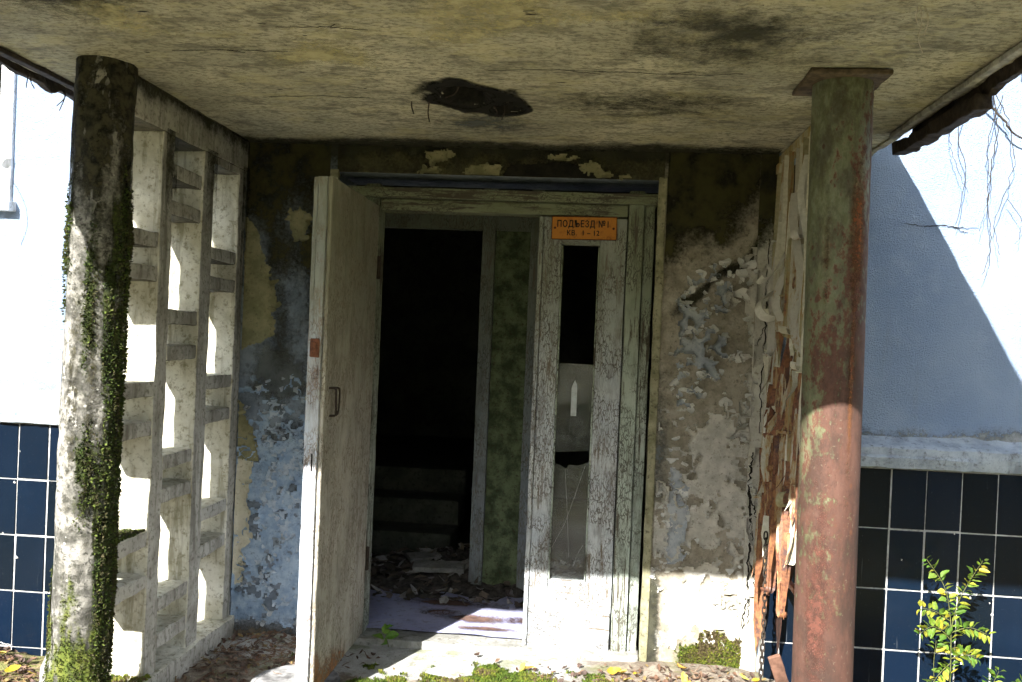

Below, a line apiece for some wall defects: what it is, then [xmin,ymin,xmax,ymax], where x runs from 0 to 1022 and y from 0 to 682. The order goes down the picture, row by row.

peeling [241,217,282,350]
damp [68,55,782,411]
peeling [417,149,456,174]
hole [411,79,533,122]
spalling [462,154,632,180]
damp [635,9,857,65]
rust [850,162,865,308]
crack [904,223,979,233]
peeling [230,374,306,628]
peeling [649,240,776,654]
crack [742,239,770,629]
rust [805,515,826,682]